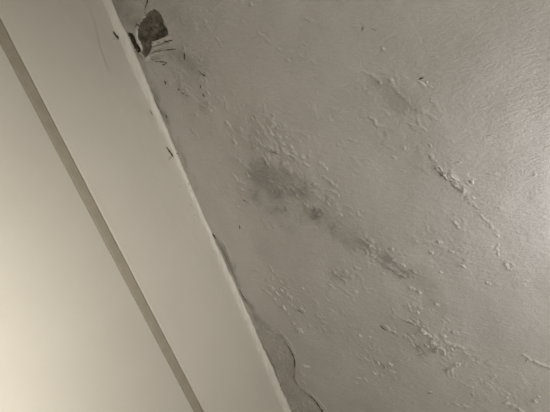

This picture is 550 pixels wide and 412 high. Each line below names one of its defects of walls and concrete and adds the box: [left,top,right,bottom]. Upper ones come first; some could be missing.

flaking render [128,0,185,65]
peeling [257,326,328,412]